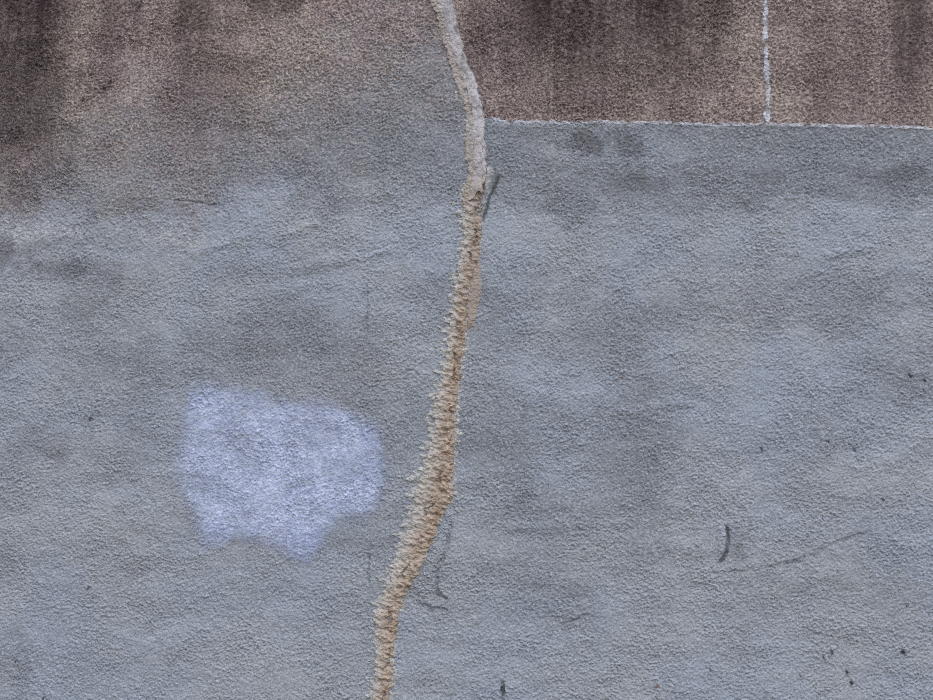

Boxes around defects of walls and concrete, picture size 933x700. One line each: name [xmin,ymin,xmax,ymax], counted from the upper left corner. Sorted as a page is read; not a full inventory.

damp [18,0,59,89]
damp [629,0,691,48]
crack [361,0,487,700]